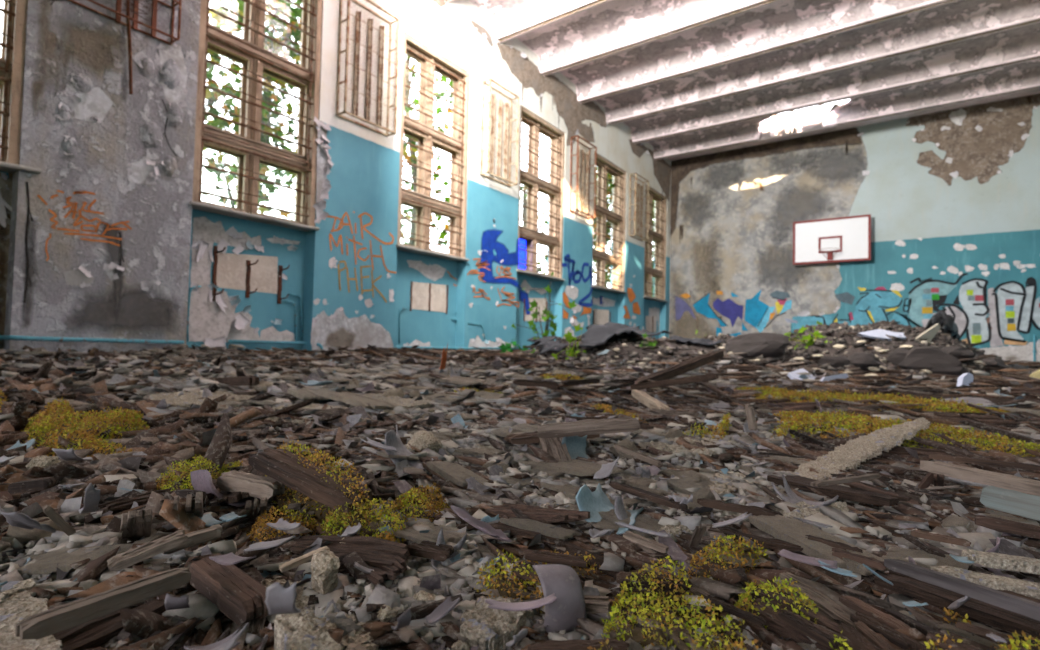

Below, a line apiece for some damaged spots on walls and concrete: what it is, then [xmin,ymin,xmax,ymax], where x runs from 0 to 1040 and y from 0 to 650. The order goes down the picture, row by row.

peeling [157,43,188,112]
peeling [70,87,113,123]
peeling [127,158,160,186]
peeling [313,117,334,224]
spalling [471,0,1040,337]
peeling [0,187,12,228]
peeling [63,262,127,288]
peeling [141,280,172,301]
peeling [189,216,300,349]
peeling [407,260,446,312]
spalling [310,294,448,369]